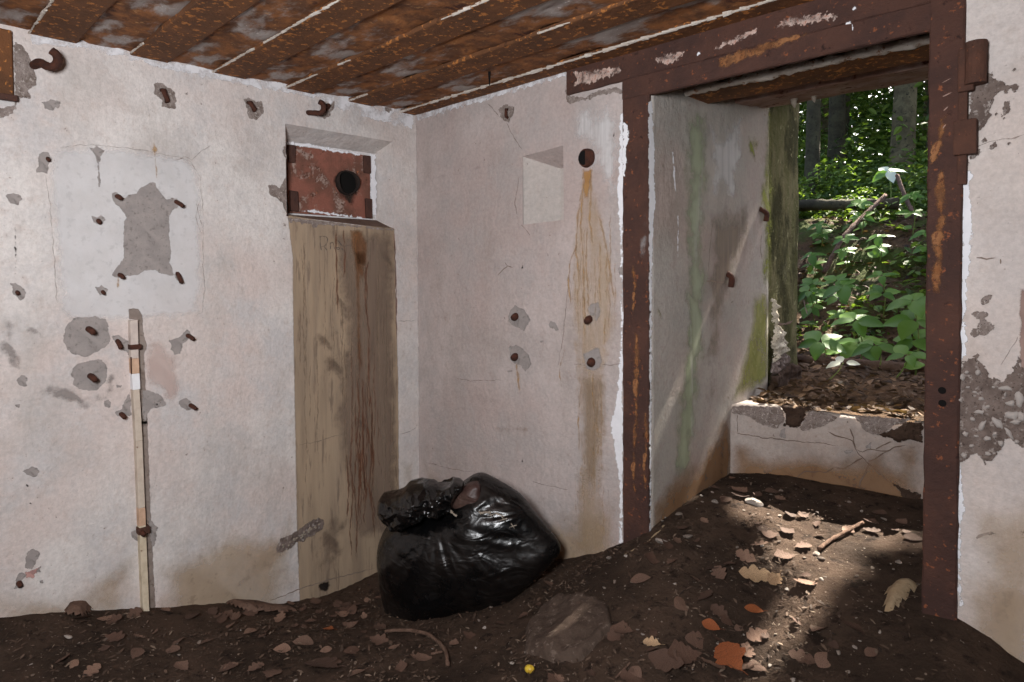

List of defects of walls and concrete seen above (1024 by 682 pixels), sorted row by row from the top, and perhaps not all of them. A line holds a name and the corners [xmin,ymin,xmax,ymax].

peeling [0,35,622,129]
corrosion [719,34,804,67]
spalling [112,182,179,280]
corrosion [567,171,612,309]
spalling [63,316,166,421]
spalling [957,73,1024,606]
spalling [731,405,786,438]
spalling [800,411,837,431]
crack [737,415,901,487]
spalling [276,518,324,552]